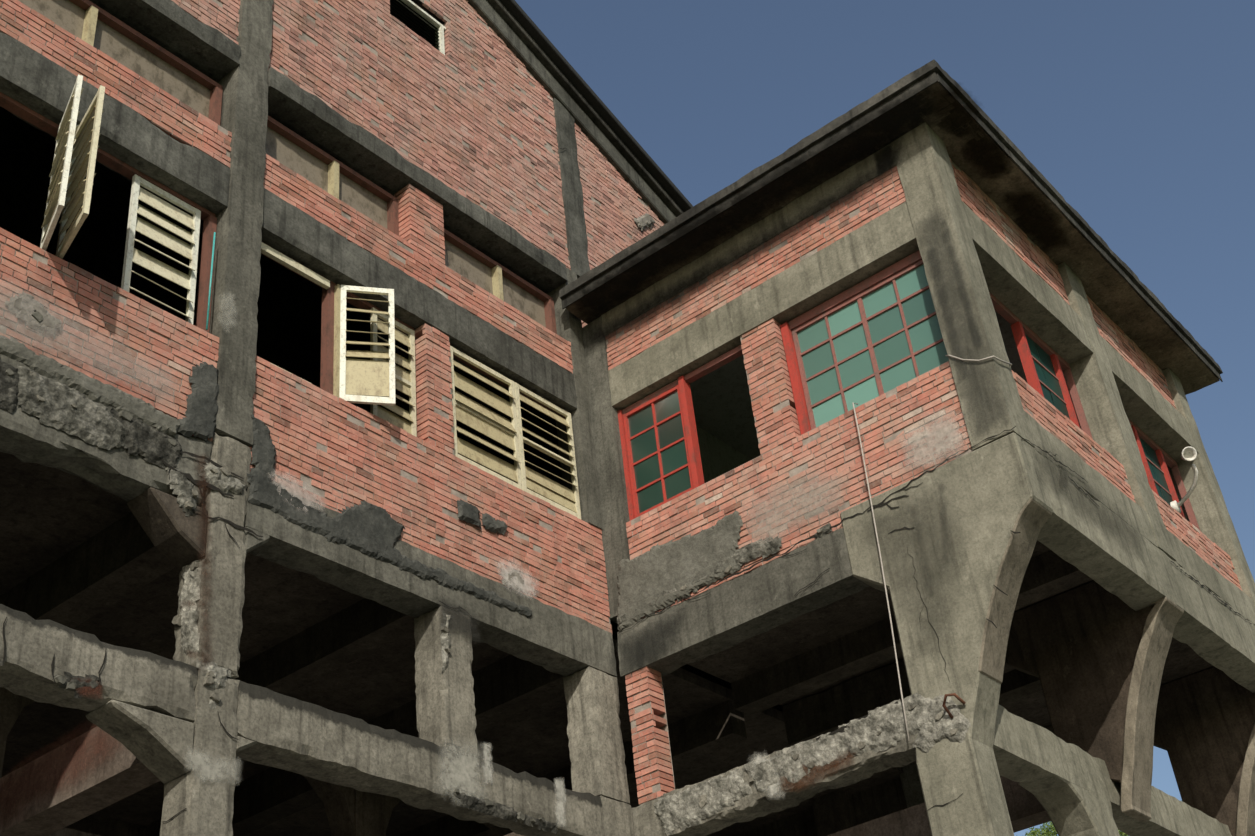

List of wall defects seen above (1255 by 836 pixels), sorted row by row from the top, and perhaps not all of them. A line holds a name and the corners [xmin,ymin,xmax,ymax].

water stain [570,88,1008,340]
water stain [1005,192,1067,251]
spalling [0,360,245,517]
spalling [617,536,782,630]
crack [618,426,1099,682]
crack [0,617,8,665]
crack [98,650,106,686]
spalling [172,559,231,709]
spalling [440,610,452,672]
spalling [444,787,558,834]
spalling [653,693,971,836]